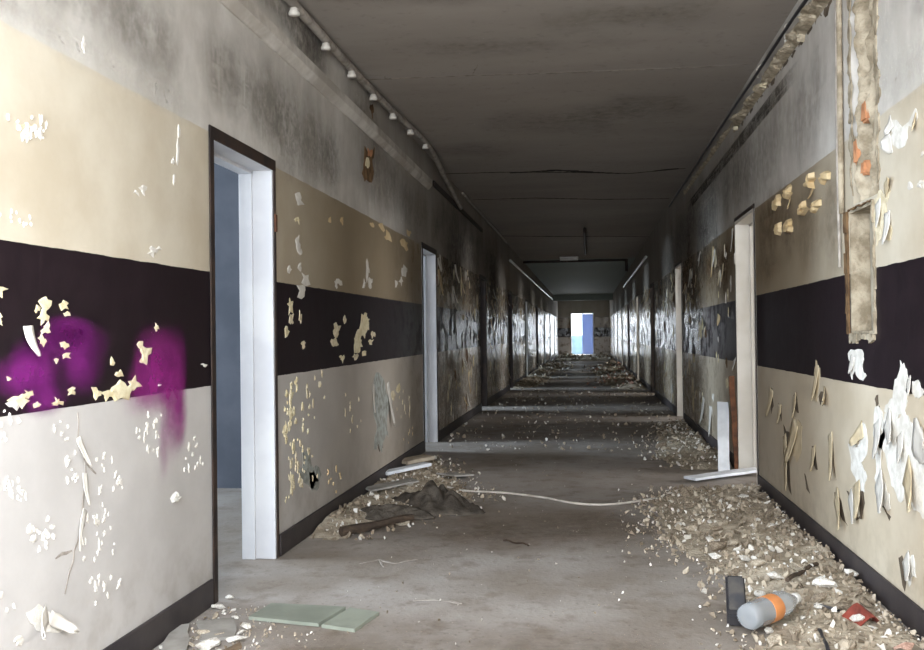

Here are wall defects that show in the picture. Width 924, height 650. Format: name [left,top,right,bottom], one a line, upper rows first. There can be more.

spalling [846,0,918,246]
peeling [771,171,831,236]
peeling [284,236,310,338]
spalling [5,390,41,411]
spalling [23,297,71,356]
spalling [54,341,71,364]
spalling [91,356,142,402]
spalling [137,341,152,365]
peeling [330,313,376,363]
peeling [848,349,867,381]
peeling [765,360,924,530]
crack [55,412,96,594]